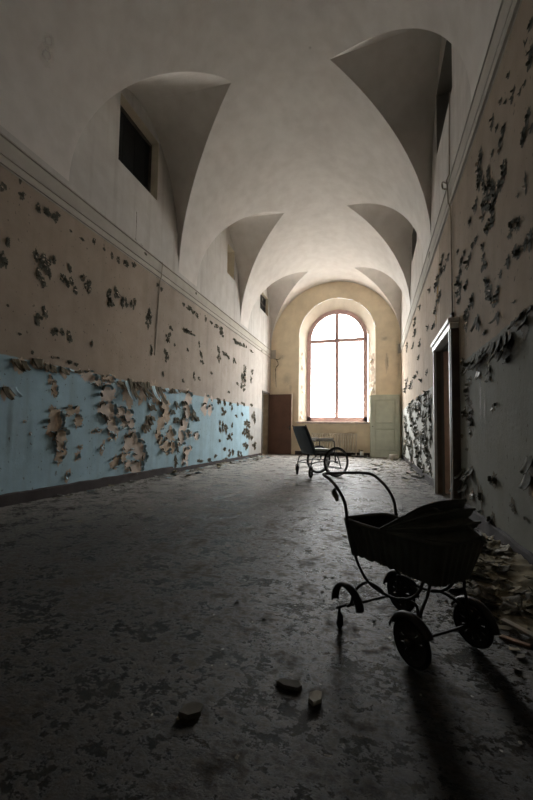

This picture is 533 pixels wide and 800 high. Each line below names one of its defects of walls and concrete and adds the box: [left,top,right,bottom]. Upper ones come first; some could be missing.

peeling [498,16,533,105]
peeling [520,106,533,148]
peeling [0,238,10,269]
peeling [32,248,92,295]
peeling [106,287,136,310]
peeling [426,113,533,438]
peeling [182,302,262,353]
peeling [405,304,421,360]
peeling [0,385,23,401]
peeling [10,325,257,484]
peeling [403,368,433,477]
peeling [449,466,497,524]